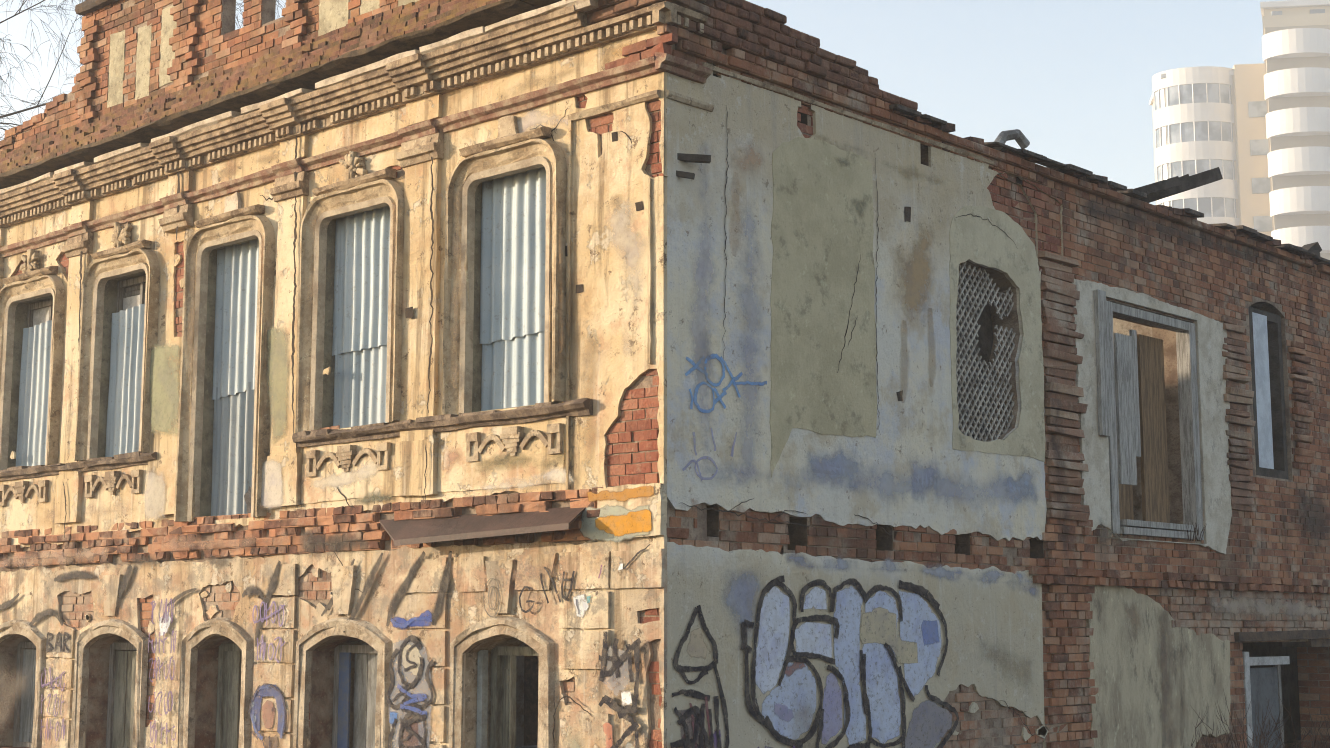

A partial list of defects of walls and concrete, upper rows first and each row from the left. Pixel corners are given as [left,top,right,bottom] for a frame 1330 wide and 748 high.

crack [260,136,298,434]
crack [426,137,434,413]
crack [837,158,881,435]
crack [421,445,429,503]
flaking render [580,369,660,542]
flaking render [919,684,1068,748]